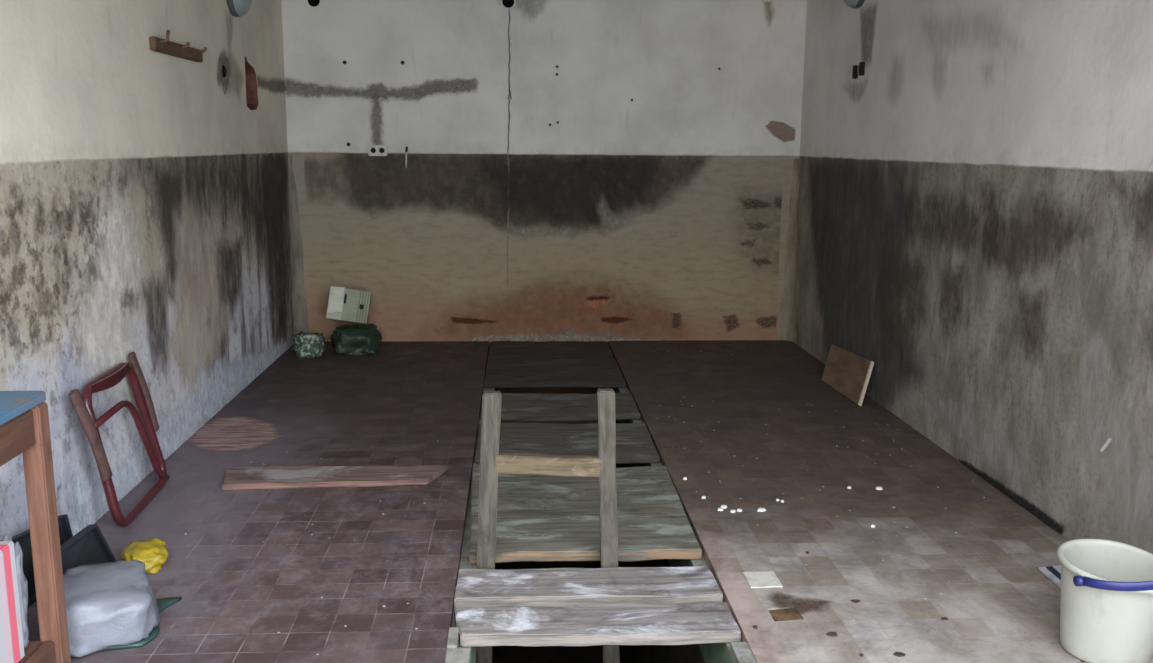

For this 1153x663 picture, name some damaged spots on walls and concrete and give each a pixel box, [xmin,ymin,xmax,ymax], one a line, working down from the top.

water stain [0,187,166,405]
water stain [70,153,293,536]
water stain [345,153,705,236]
peeling [765,120,796,143]
water stain [810,162,1074,403]
water stain [1081,337,1153,554]